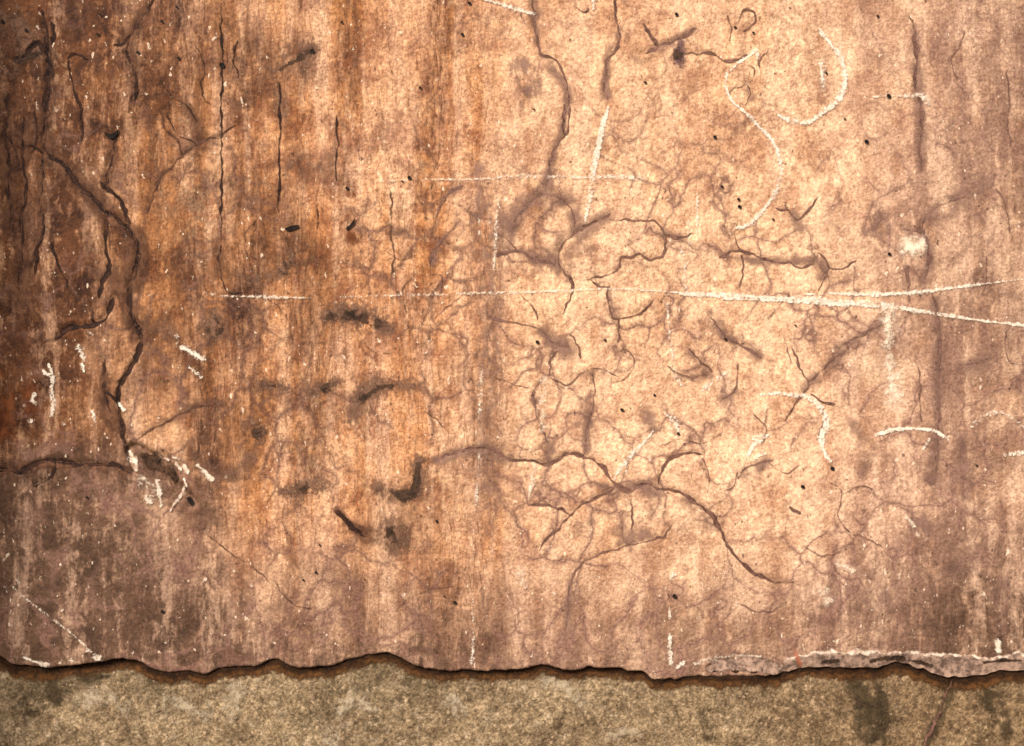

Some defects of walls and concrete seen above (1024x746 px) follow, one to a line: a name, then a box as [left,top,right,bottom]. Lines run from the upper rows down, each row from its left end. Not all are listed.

crack [0,0,293,487]
crack [315,116,339,251]
crack [385,185,462,318]
crack [432,0,1023,631]
crack [334,507,380,543]
spalling [694,639,1024,682]